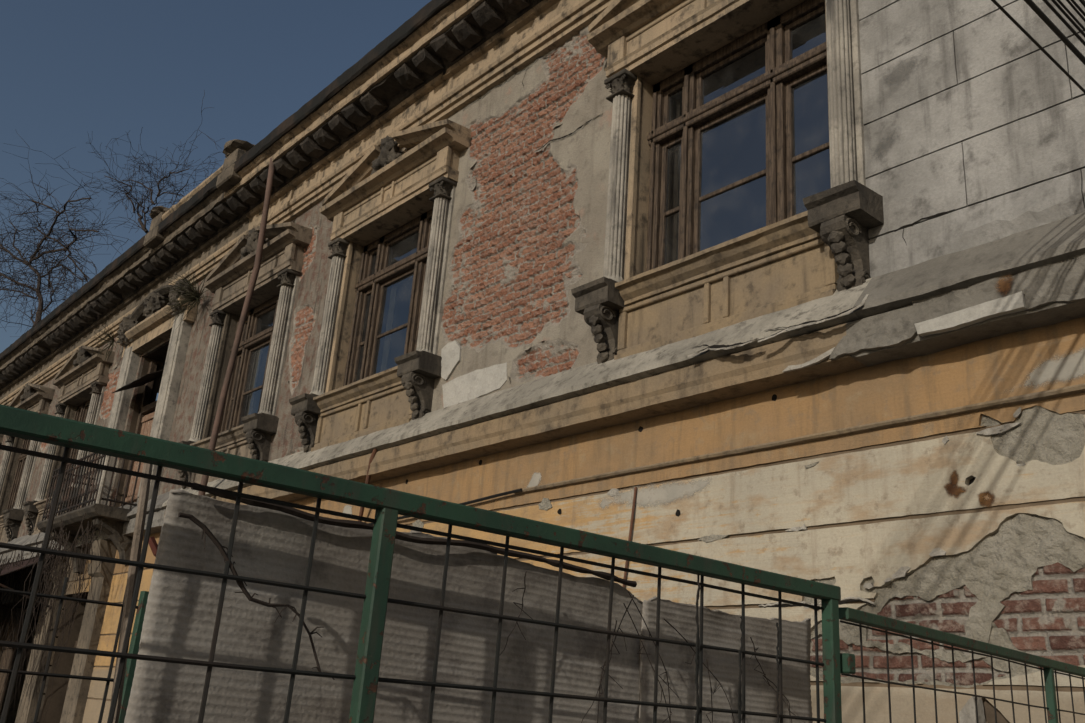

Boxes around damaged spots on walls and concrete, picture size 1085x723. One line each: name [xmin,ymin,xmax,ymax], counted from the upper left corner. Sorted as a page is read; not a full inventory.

flaking render [440,31,606,383]
flaking render [288,304,317,395]
peeling [1025,349,1085,385]
flaking render [976,406,1085,466]
corrosion [944,470,966,498]
corrosion [978,491,994,507]
flaking render [839,513,1085,688]
flaking render [810,621,823,680]